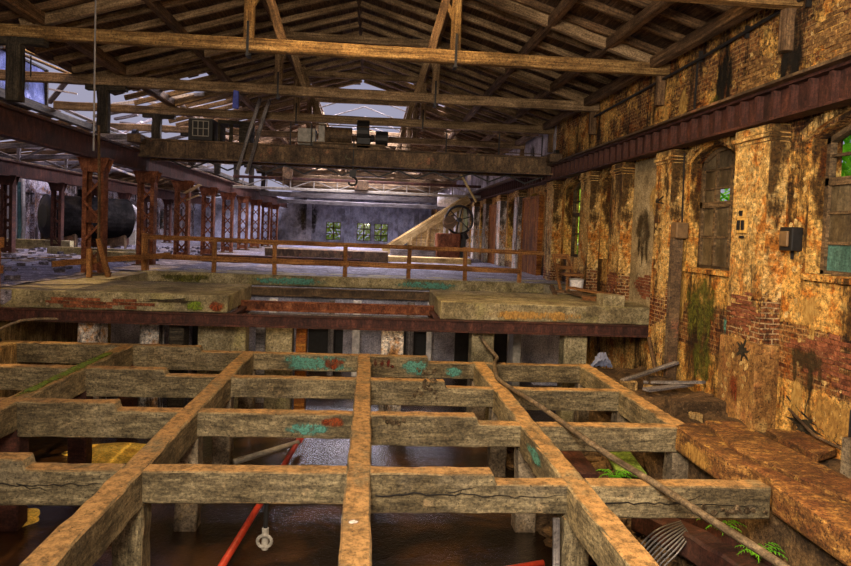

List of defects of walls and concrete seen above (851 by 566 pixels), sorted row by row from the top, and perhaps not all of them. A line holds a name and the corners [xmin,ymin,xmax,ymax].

water stain [636,184,656,265]
spalling [721,292,760,397]
spalling [785,333,851,407]
spalling [785,411,841,437]